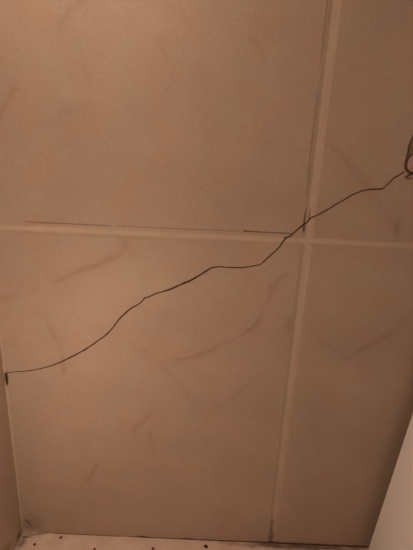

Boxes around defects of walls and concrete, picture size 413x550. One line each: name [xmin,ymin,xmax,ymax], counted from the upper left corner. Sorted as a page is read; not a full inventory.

crack [5,172,404,385]